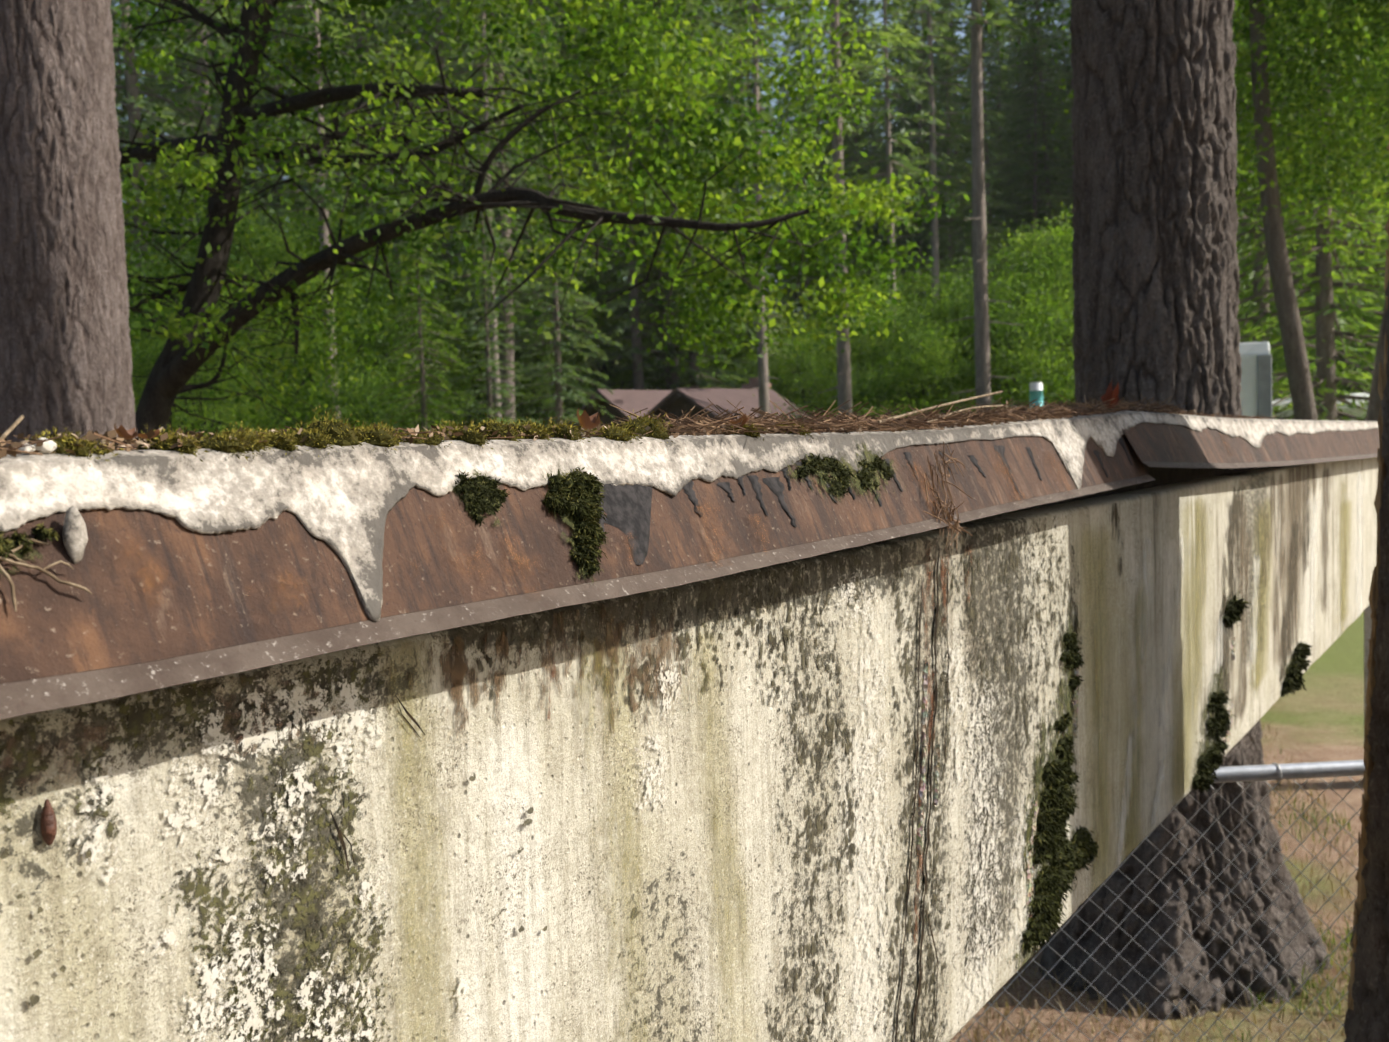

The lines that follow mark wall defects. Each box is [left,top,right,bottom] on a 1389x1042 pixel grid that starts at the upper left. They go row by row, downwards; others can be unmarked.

rust [216,674,334,756]
water stain [0,513,1080,1042]
crack [895,552,949,1042]
rust [921,540,949,751]
water stain [1111,502,1123,575]
water stain [1216,464,1361,727]